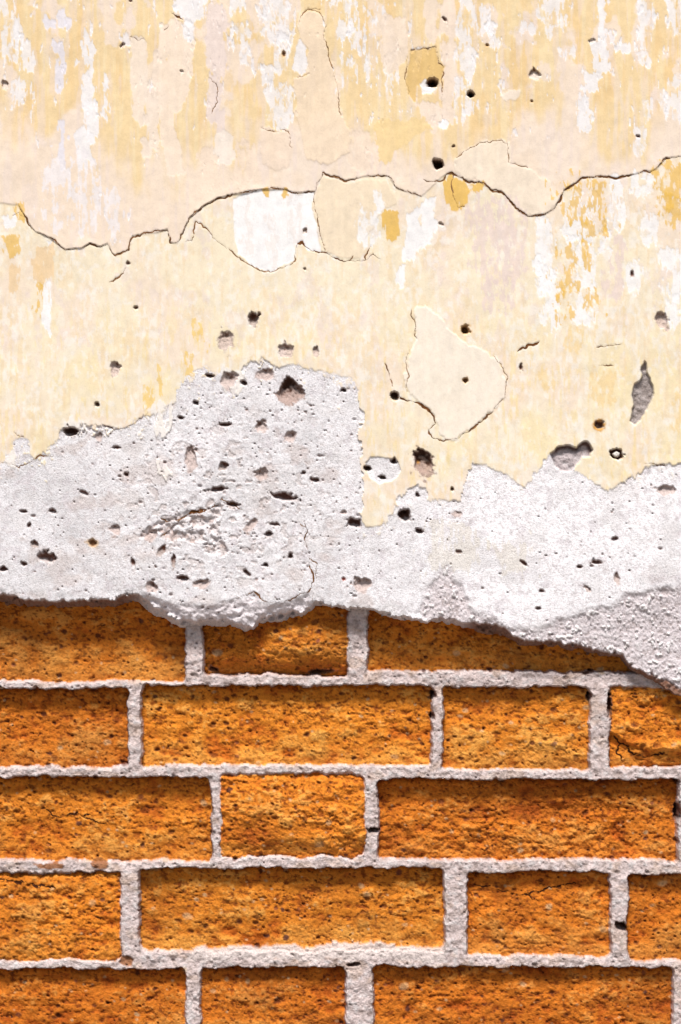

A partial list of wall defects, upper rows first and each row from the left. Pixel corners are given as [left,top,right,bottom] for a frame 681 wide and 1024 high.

peeling [119,0,499,295]
crack [14,140,670,282]
crack [385,310,539,442]
flaking render [0,307,681,769]
peeling [118,955,136,968]